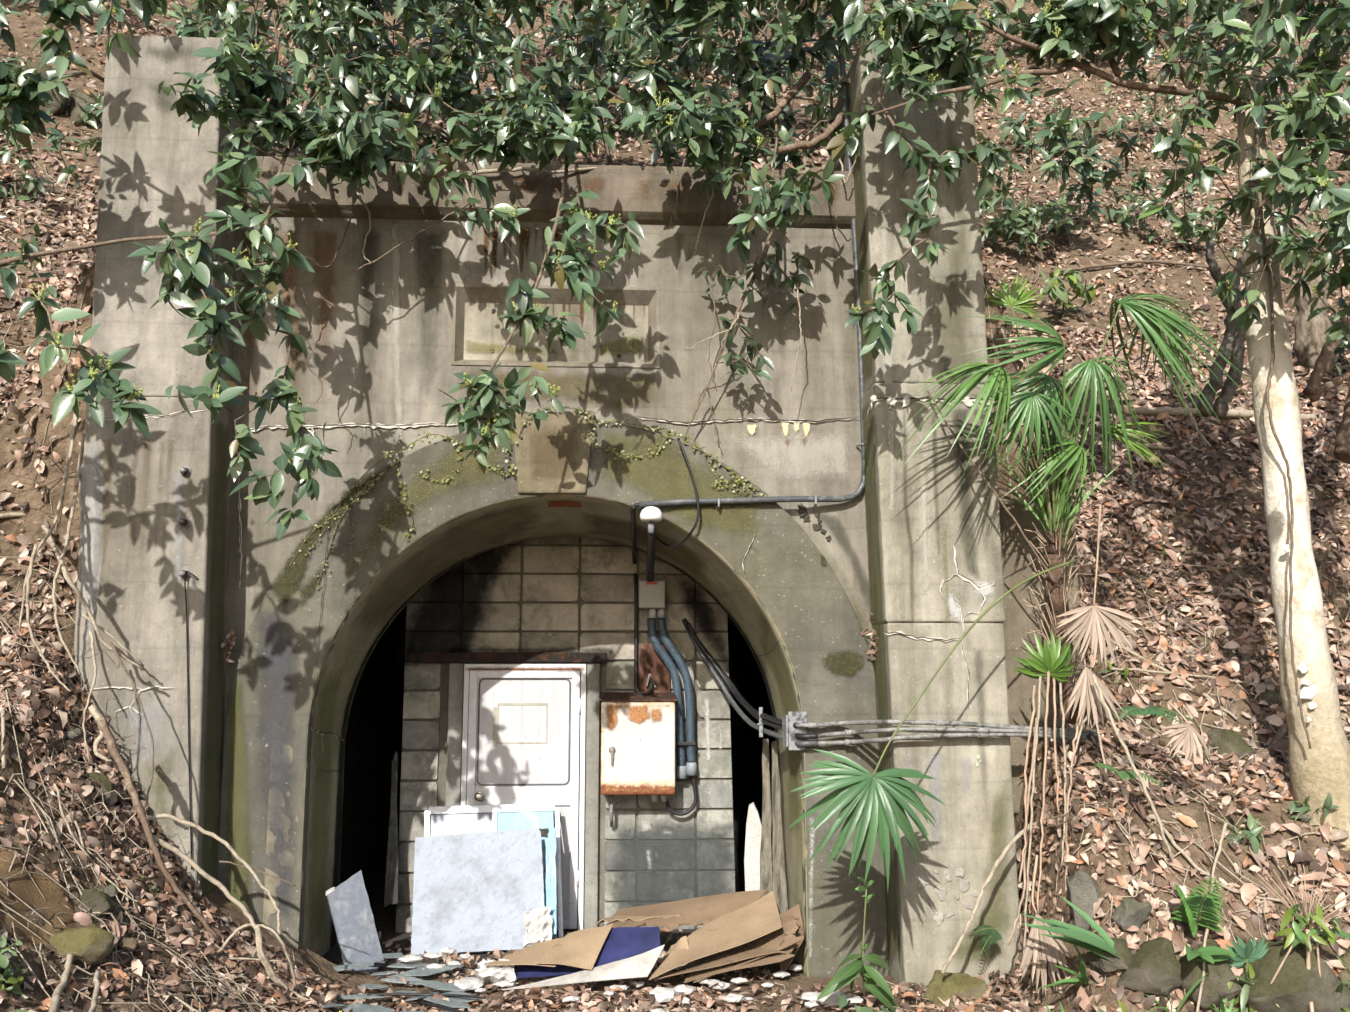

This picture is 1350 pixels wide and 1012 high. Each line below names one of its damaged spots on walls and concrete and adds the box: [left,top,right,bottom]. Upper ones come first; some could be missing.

corrosion [484,227,561,271]
crack [884,545,995,709]
water stain [259,616,296,910]